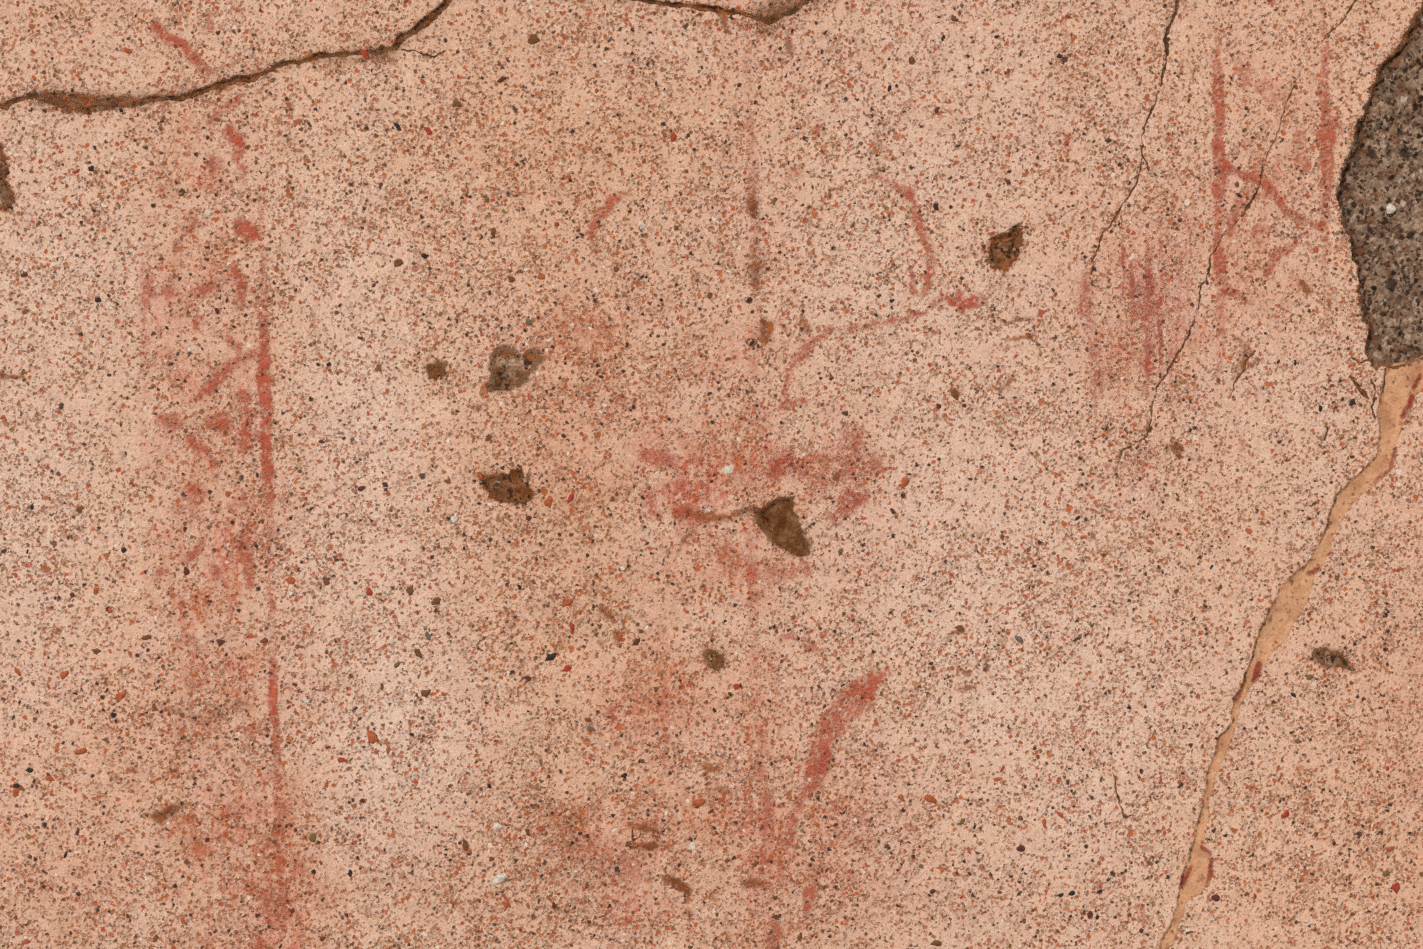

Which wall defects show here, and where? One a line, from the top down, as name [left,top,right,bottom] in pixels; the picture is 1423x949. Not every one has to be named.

flaking render [0,144,15,210]
crack [0,0,451,109]
crack [618,0,809,45]
crack [1091,0,1179,274]
crack [1116,0,1357,478]
flaking render [1336,2,1423,370]
crack [1159,356,1423,949]